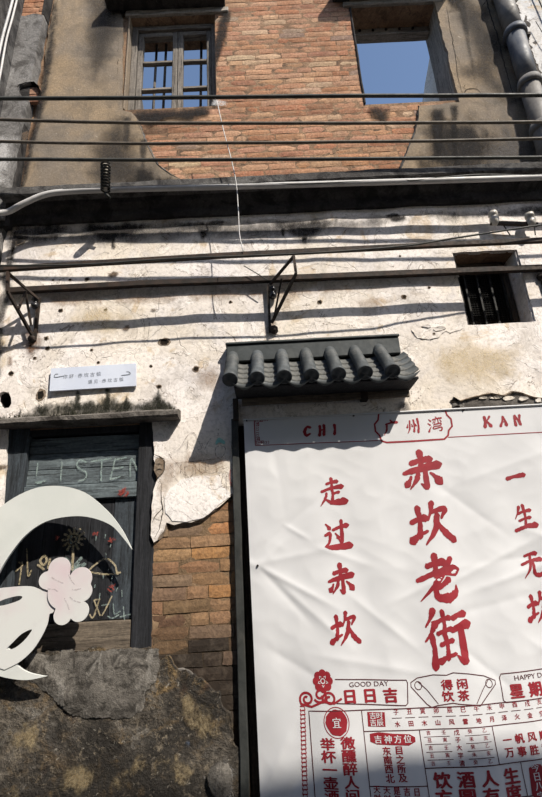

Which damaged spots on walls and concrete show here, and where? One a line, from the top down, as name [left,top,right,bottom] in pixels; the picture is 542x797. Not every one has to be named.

spalling [22,0,48,24]
water stain [90,0,119,66]
spalling [17,82,42,105]
water stain [18,3,57,187]
spalling [134,0,443,179]
water stain [369,107,389,120]
water stain [420,105,532,168]
water stain [0,214,405,355]
spalling [151,475,249,746]